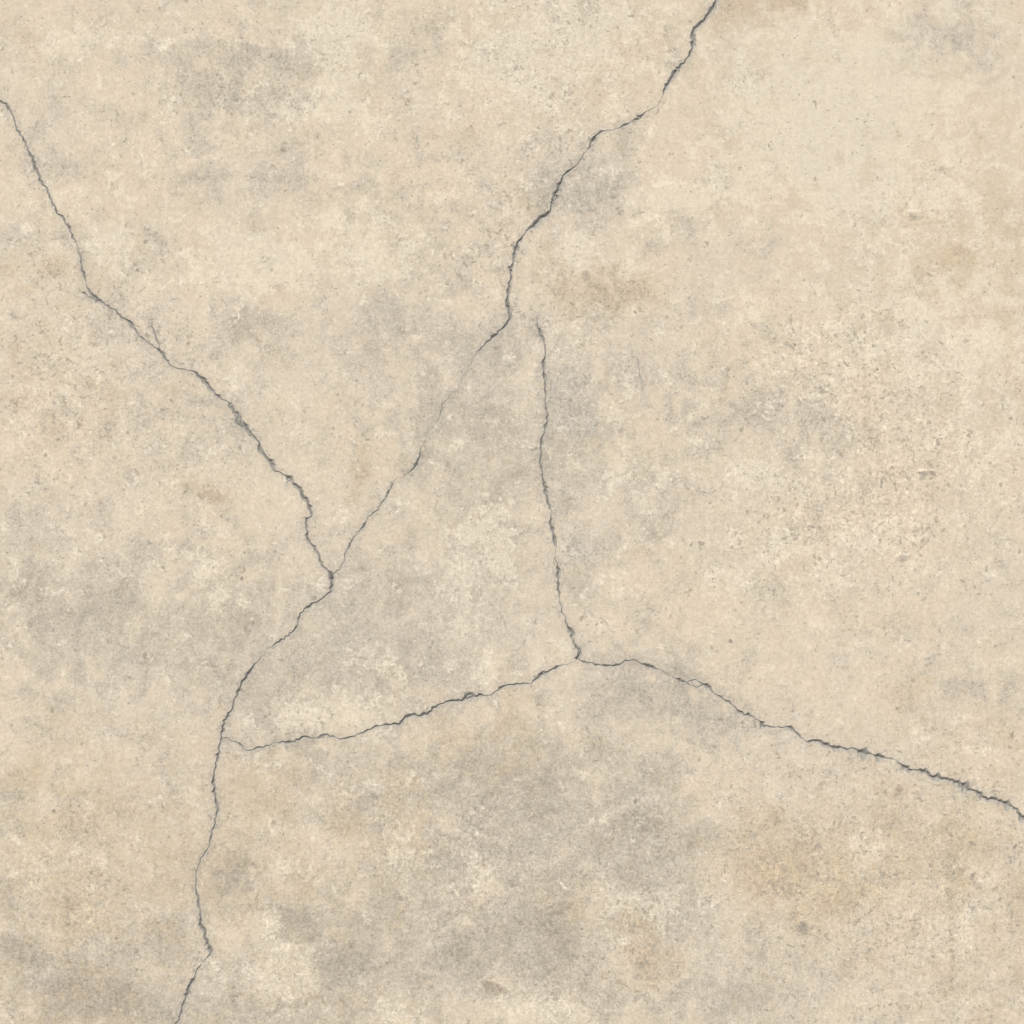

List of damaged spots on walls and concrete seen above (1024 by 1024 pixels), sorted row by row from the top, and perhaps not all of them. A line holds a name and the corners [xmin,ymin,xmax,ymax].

crack [0,100,396,648]
crack [458,0,718,388]
crack [174,319,1024,1024]